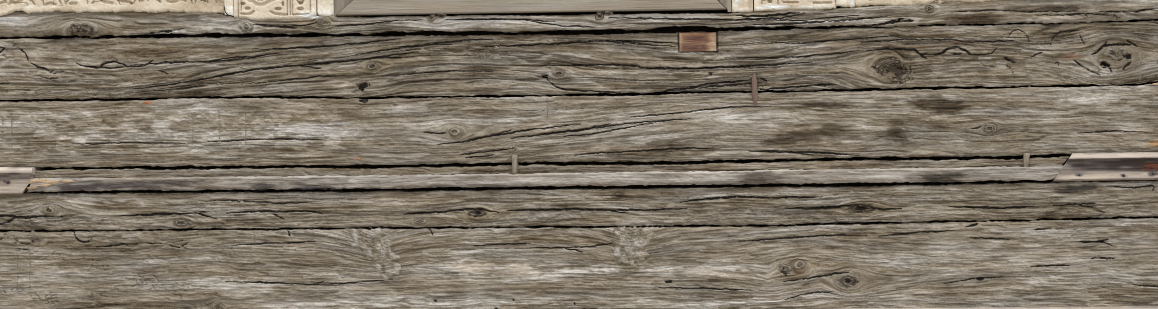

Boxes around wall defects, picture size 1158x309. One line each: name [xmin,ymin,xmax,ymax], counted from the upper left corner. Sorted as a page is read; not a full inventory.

crack [0,6,1155,158]